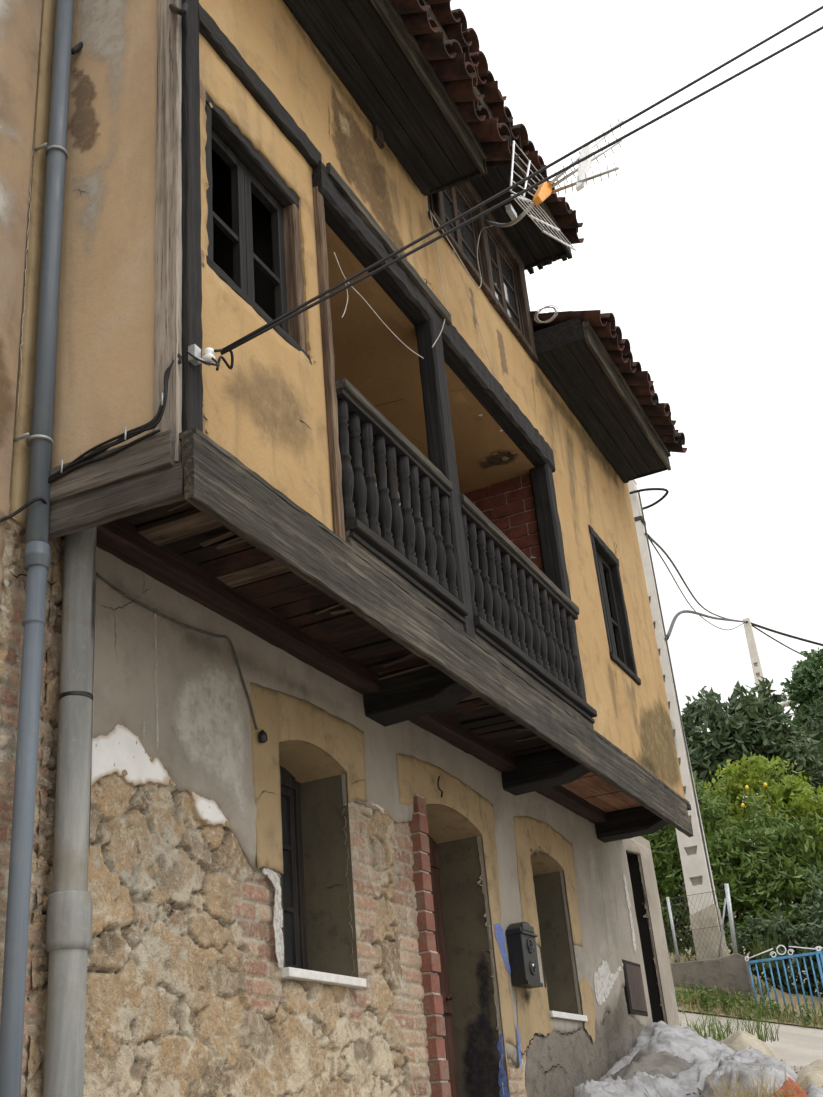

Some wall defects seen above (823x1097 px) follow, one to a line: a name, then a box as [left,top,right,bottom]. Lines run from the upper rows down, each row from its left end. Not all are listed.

peeling [91,724,176,787]
peeling [190,792,232,829]
spalling [263,867,284,968]
spalling [594,960,623,1005]
crack [523,1028,584,1079]